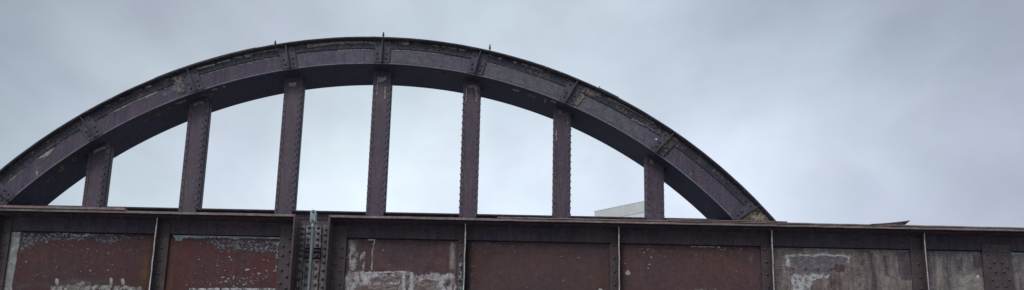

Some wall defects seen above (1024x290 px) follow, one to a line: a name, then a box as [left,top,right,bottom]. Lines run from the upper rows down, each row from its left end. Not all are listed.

peeling [4,232,143,290]
peeling [173,235,280,290]
peeling [344,239,463,290]
peeling [782,249,850,290]